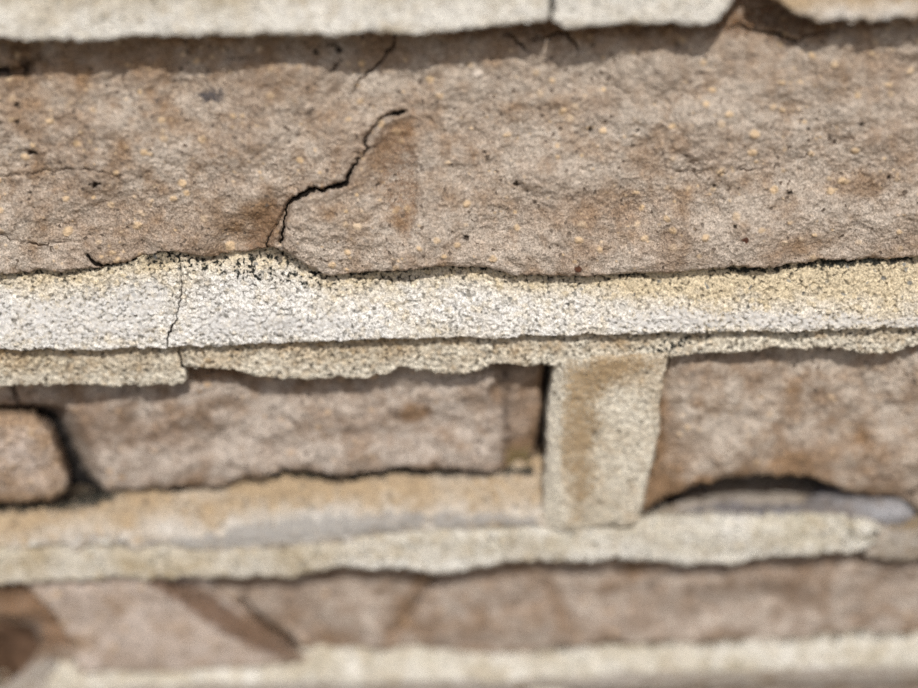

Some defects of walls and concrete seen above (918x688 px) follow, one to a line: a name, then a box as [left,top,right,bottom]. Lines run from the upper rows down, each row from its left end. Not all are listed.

crack [503,0,577,50]
crack [265,110,405,247]
crack [166,261,186,368]